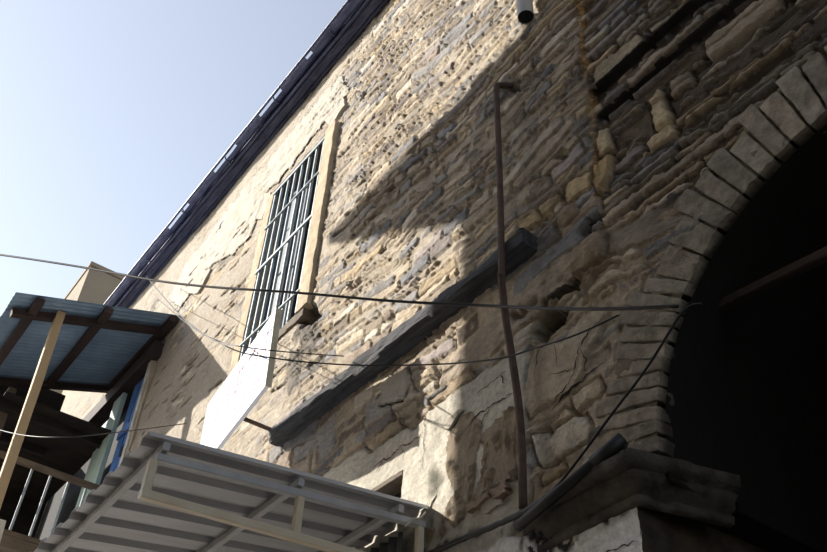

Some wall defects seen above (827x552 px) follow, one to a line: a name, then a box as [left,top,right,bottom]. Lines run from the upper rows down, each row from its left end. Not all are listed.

peeling [170,75,350,312]
crack [374,407,428,472]
spalling [444,405,518,528]
crack [453,371,512,427]
crack [535,321,606,409]